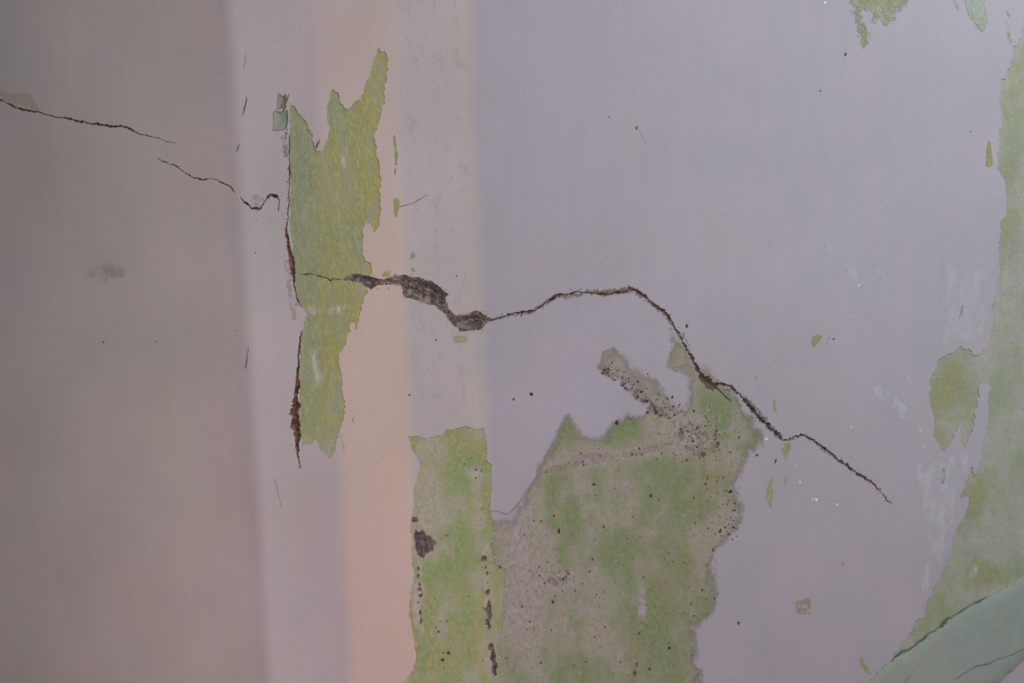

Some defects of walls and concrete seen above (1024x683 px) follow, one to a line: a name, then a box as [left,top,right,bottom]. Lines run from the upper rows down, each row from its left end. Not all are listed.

peeling [850,0,908,48]
peeling [954,0,987,32]
peeling [274,48,399,458]
crack [0,99,891,503]
peeling [404,338,763,683]
peeling [893,13,1024,657]